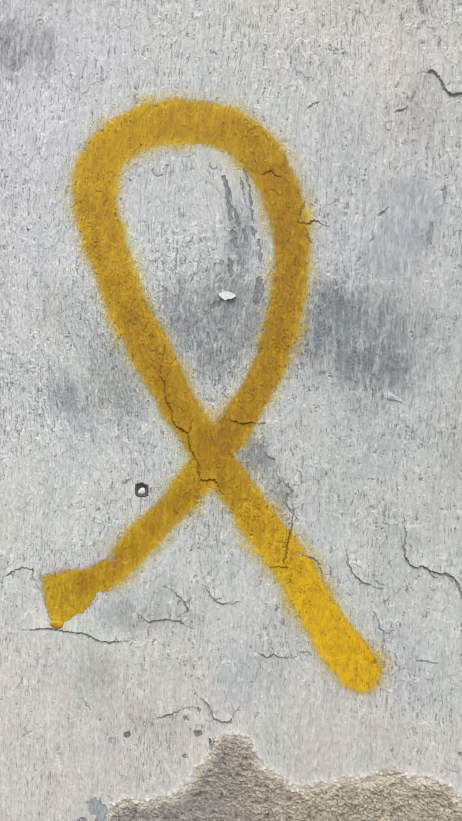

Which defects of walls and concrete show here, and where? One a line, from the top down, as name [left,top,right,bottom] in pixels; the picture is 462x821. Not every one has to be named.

crack [421,69,462,98]
crack [152,344,224,495]
crack [376,514,462,599]
crack [18,584,238,644]
crack [346,554,438,666]
crack [157,692,239,724]
spalling [77,730,462,821]